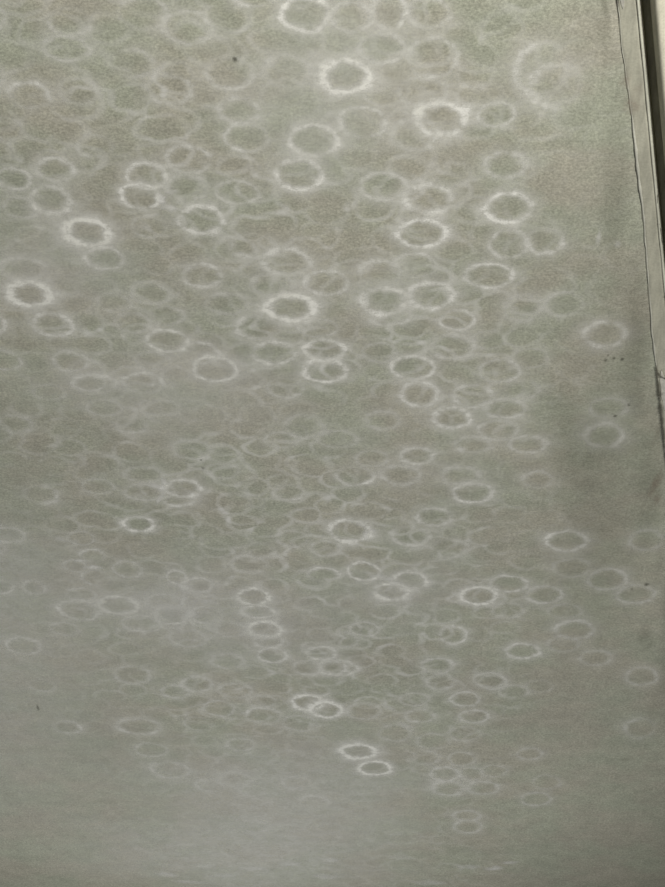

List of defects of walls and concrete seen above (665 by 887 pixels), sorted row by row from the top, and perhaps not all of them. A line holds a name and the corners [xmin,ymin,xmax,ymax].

damp [275,0,347,35]
damp [302,0,420,98]
damp [272,97,516,194]
damp [1,277,76,337]
damp [3,156,123,270]
damp [234,245,350,330]
damp [235,317,350,384]
damp [357,172,455,273]
damp [355,279,549,454]
damp [462,190,565,290]
damp [289,693,348,719]
damp [335,741,394,776]